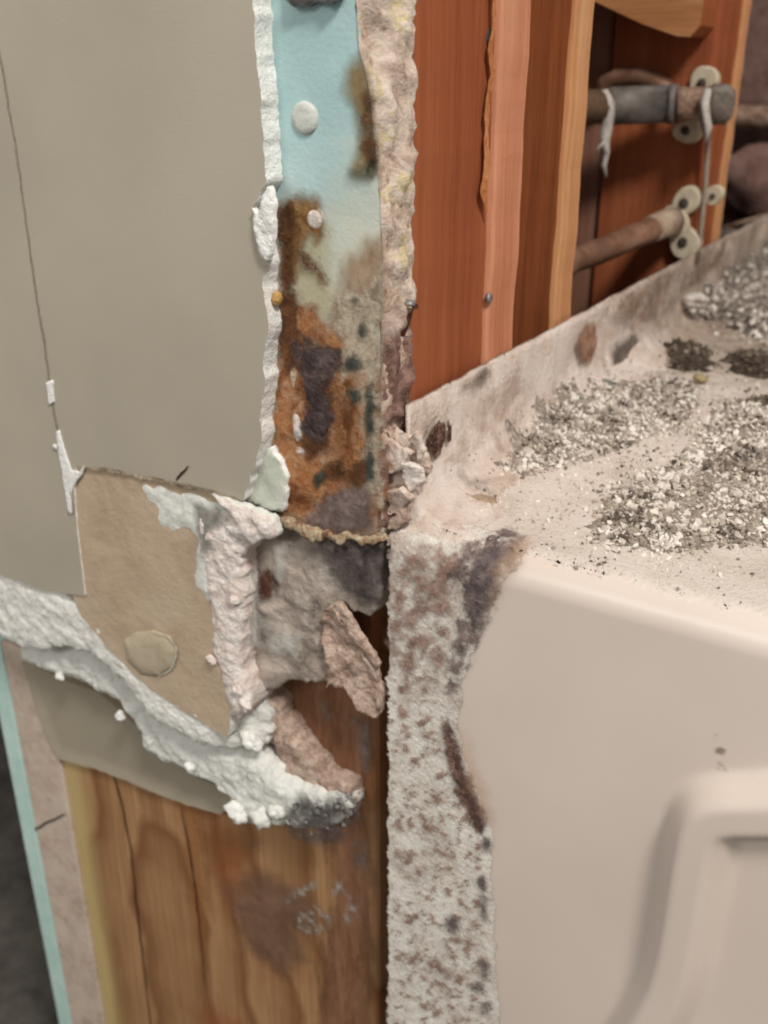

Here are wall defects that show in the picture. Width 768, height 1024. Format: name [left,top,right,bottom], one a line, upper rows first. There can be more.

leakage [328,241,388,507]
mould [313,472,325,490]
flaking render [142,484,283,601]
leakage [354,612,367,636]
peeling [232,684,253,714]
peeling [237,729,265,752]
leakage [284,679,379,776]
peeling [223,800,285,830]
leakage [236,790,374,1024]